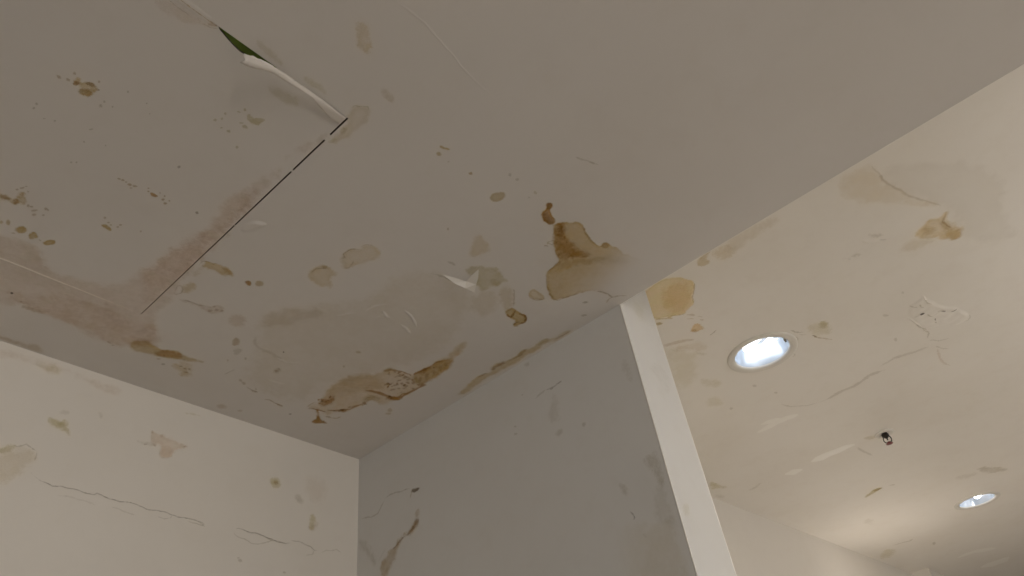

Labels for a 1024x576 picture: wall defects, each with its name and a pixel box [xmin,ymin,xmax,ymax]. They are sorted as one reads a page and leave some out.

peeling [444,269,479,293]